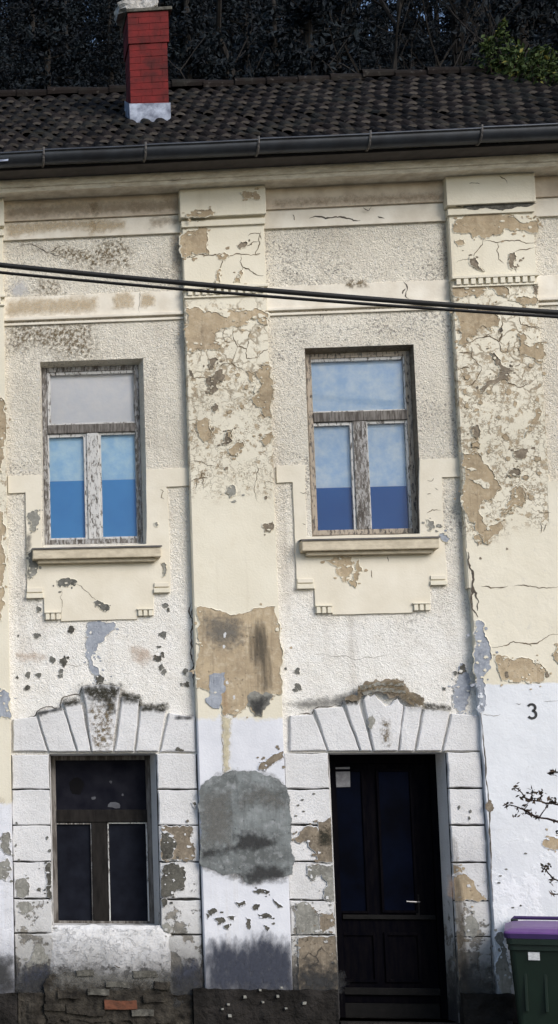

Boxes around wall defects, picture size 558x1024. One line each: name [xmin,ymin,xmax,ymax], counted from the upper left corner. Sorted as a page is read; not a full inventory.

crack [293,208,383,221]
peeling [452,202,543,272]
peeling [178,306,276,471]
peeling [449,282,549,560]
crack [467,553,555,617]
peeling [180,603,302,718]
crack [494,634,558,648]
spalling [159,801,198,907]
leakage [203,794,272,856]
leakage [246,866,285,882]
spalling [205,793,338,990]
leakage [0,936,342,992]